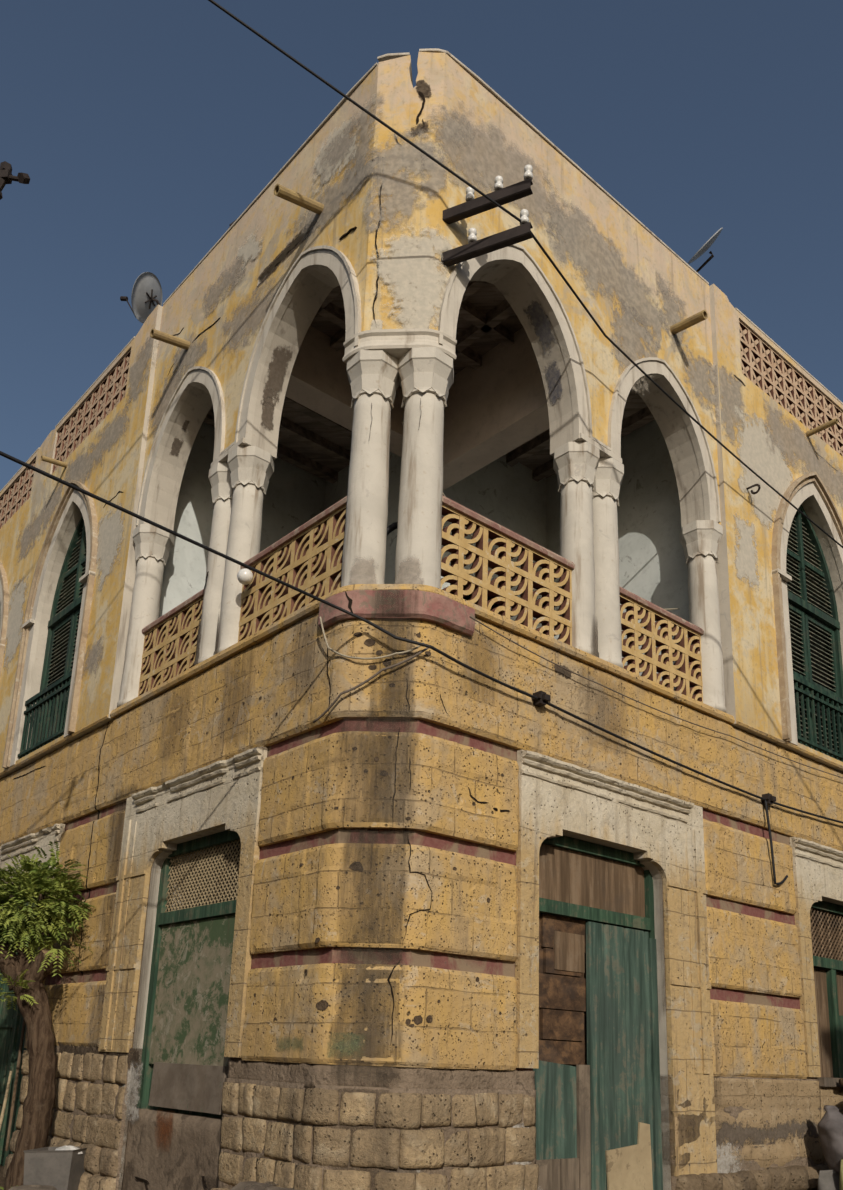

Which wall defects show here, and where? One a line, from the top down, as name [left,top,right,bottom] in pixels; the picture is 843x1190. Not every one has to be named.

flaking render [204,233,263,315]
crack [339,80,432,323]
flaking render [223,94,843,588]
damp [98,747,264,1121]
crack [387,678,432,1045]
crack [468,787,509,812]